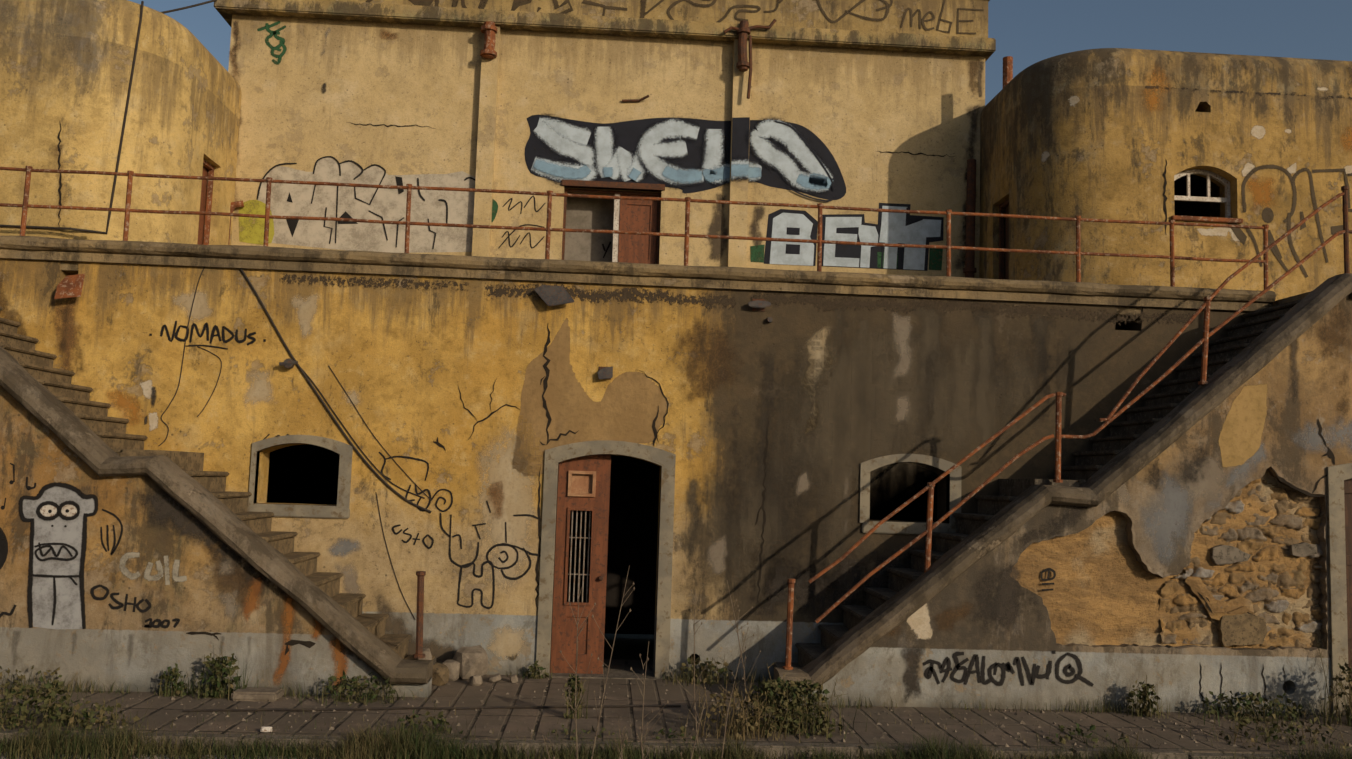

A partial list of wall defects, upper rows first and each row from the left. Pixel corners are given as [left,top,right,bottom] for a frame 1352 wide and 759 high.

spalling [280,274,467,335]
spalling [485,283,1194,324]
crack [433,325,579,610]
peeling [479,318,670,585]
peeling [797,473,809,493]
peeling [709,538,725,573]
spalling [1014,444,1323,649]